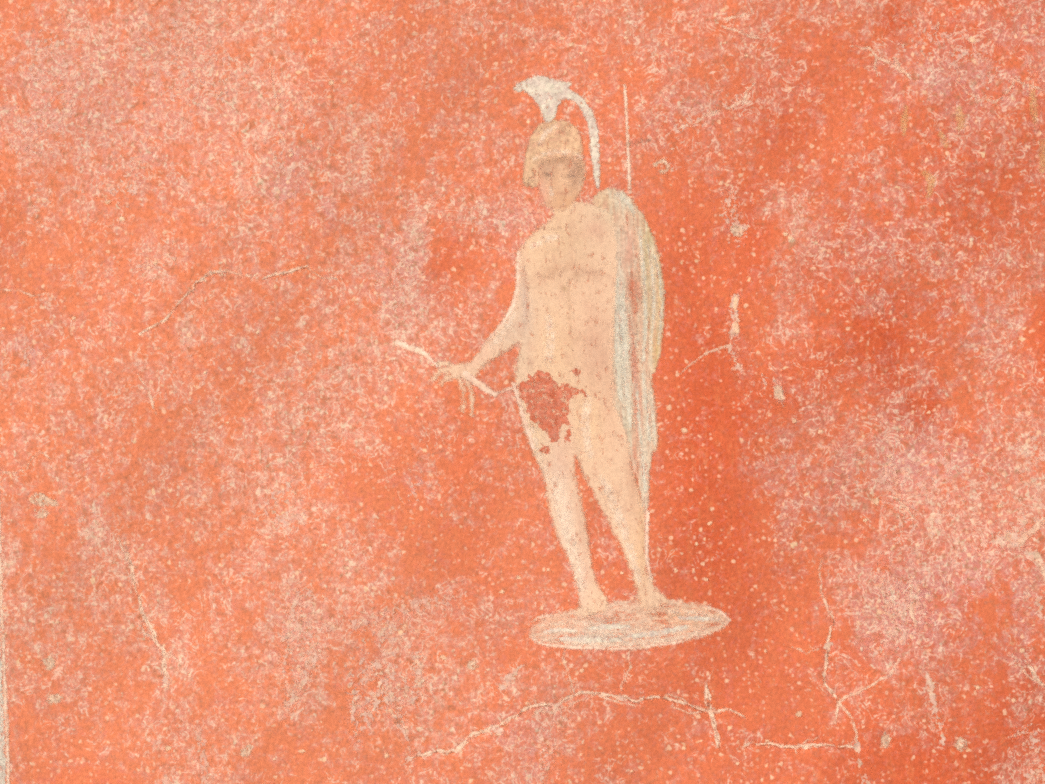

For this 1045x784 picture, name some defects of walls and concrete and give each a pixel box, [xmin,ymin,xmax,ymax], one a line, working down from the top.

crack [138,264,338,336]
crack [404,559,900,764]